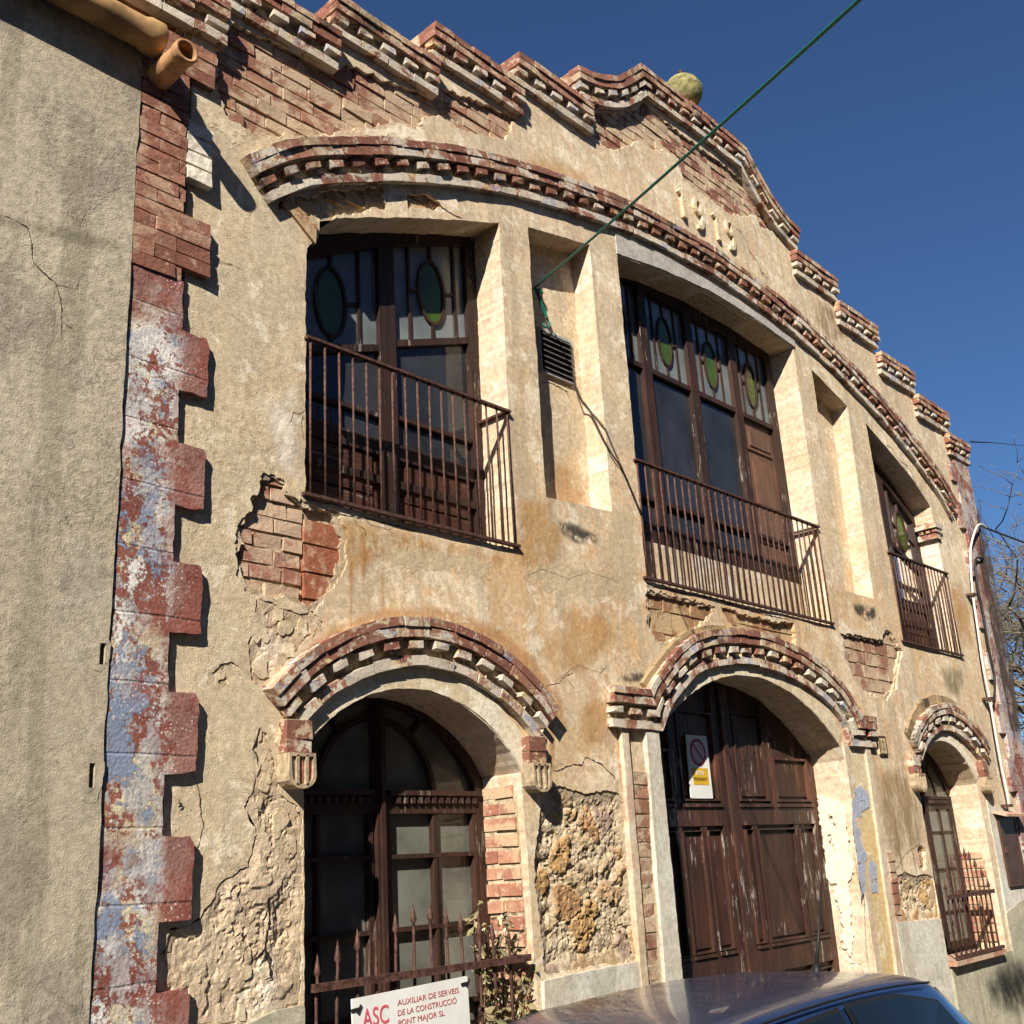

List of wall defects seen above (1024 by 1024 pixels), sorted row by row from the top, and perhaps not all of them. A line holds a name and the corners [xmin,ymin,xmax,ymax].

crack [6,216,83,344]
flaking render [212,473,348,688]
flaking render [645,590,793,648]
flaking render [841,630,901,700]
crack [557,757,619,783]
flaking render [163,723,304,1024]
flaking render [480,771,660,1024]
peeling [817,786,938,962]